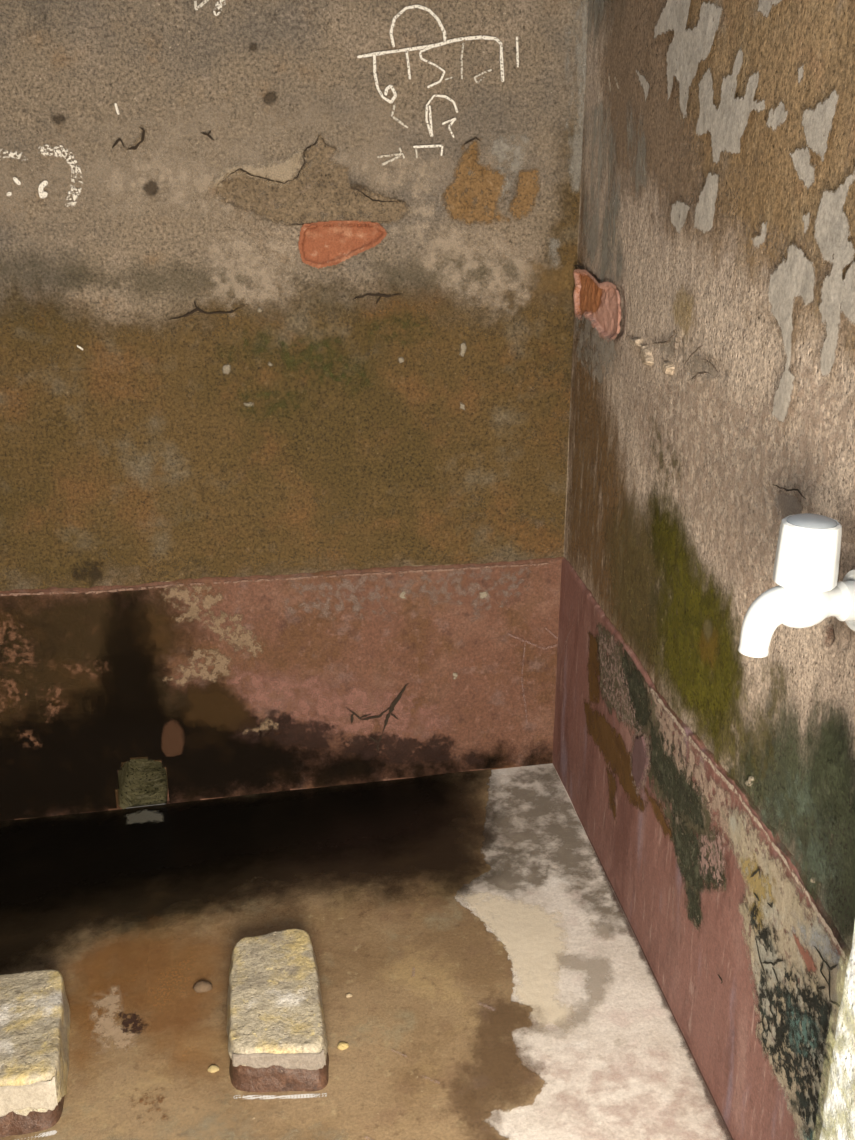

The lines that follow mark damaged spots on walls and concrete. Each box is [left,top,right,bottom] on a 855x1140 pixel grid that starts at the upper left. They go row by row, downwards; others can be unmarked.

flaking render [213,135,410,269]
water stain [0,0,855,687]
flaking render [443,137,540,225]
flaking render [636,70,650,101]
flaking render [573,264,718,383]
flaking render [654,0,788,233]
flaking render [753,222,767,247]
flaking render [768,90,855,422]
crack [345,683,409,751]
water stain [596,623,848,966]
flaking render [700,810,847,1140]
water stain [746,893,840,1140]